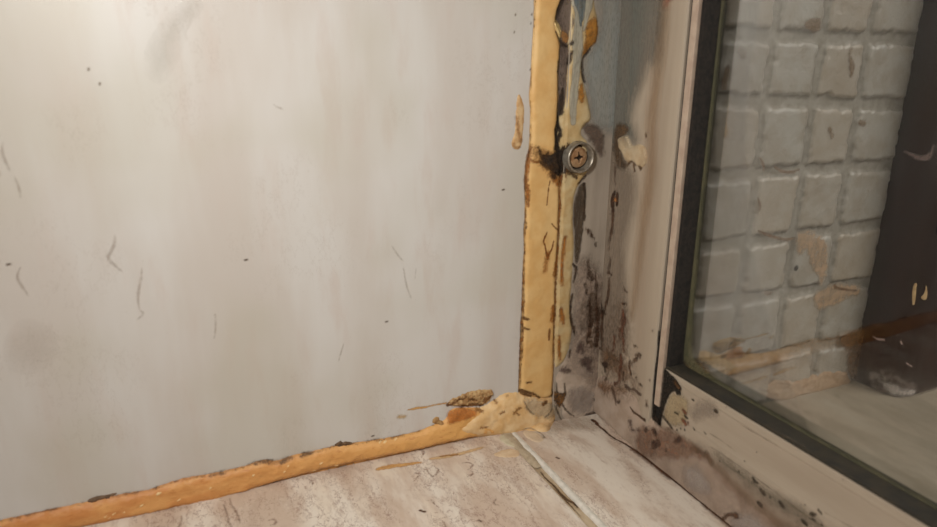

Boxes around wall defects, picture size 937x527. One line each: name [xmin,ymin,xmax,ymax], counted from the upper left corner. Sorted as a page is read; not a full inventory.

peeling [585,0,662,172]
damp [576,260,641,385]
damp [548,367,574,420]
damp [628,331,720,465]